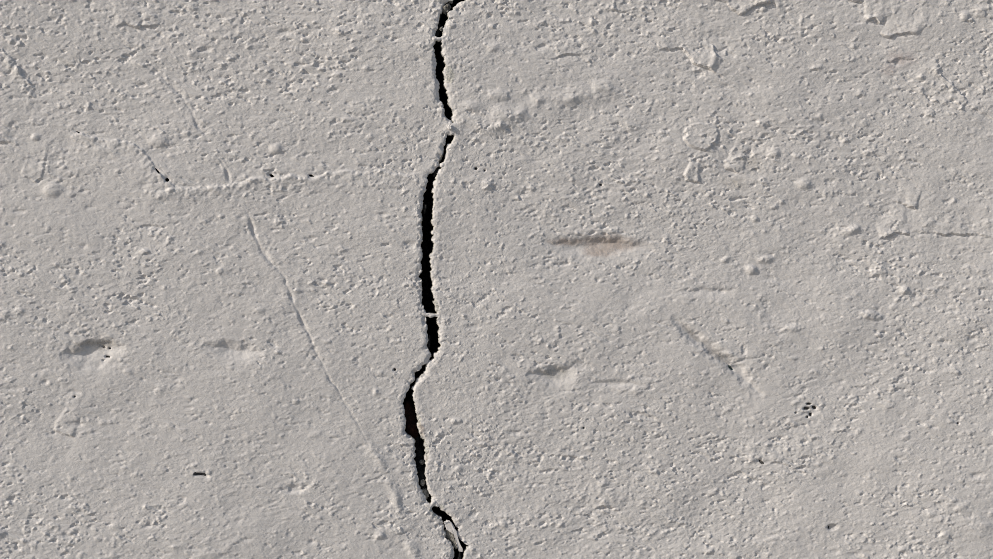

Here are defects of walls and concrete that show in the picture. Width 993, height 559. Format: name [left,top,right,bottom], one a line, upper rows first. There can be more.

crack [74,0,469,559]